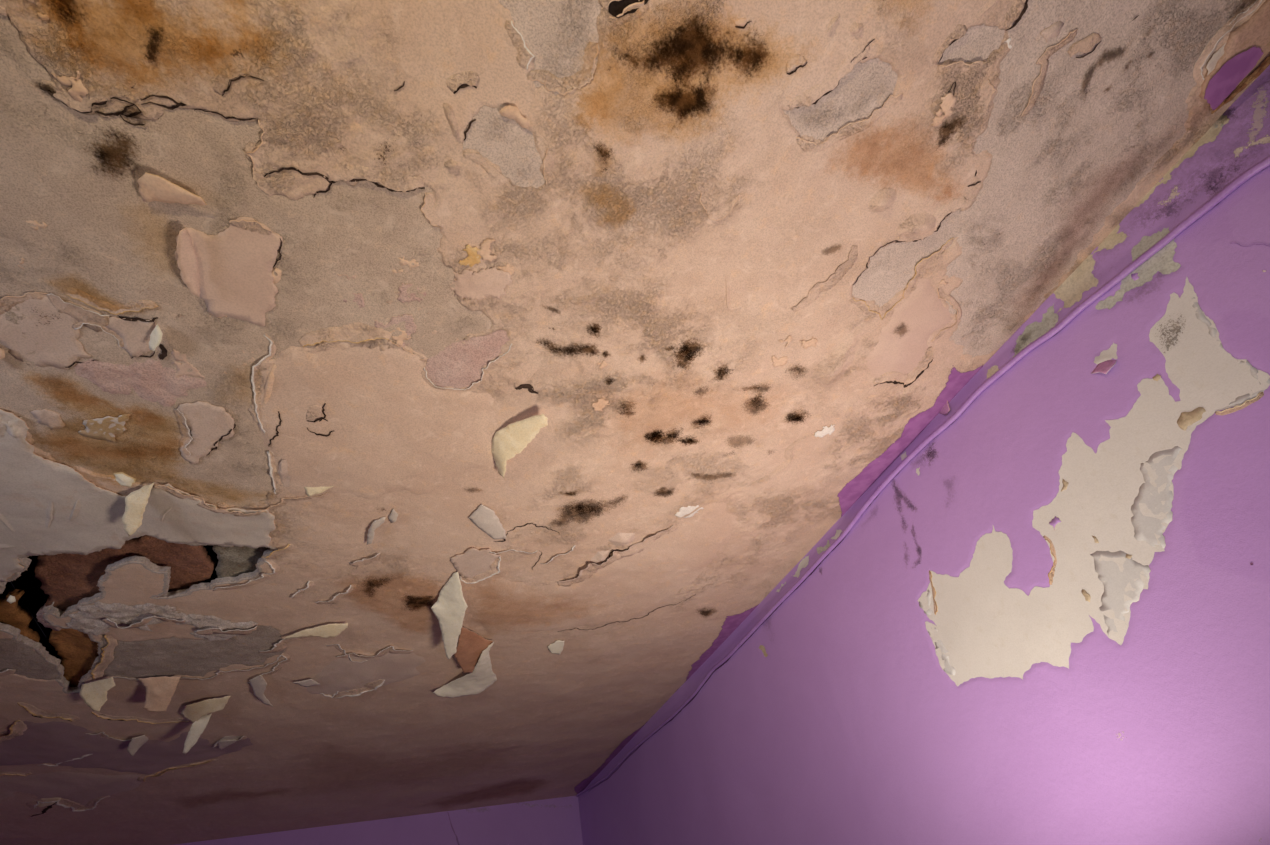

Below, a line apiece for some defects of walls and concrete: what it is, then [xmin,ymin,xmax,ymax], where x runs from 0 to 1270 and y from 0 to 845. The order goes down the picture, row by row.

peeling [499,0,601,96]
leakage [609,15,767,120]
peeling [783,39,903,152]
leakage [93,130,136,175]
peeling [0,6,554,680]
leakage [537,325,608,357]
leakage [667,339,703,368]
peeling [850,0,1270,686]
leakage [644,420,710,445]
leakage [553,491,621,526]
peeling [431,424,842,698]
peeling [0,601,368,777]